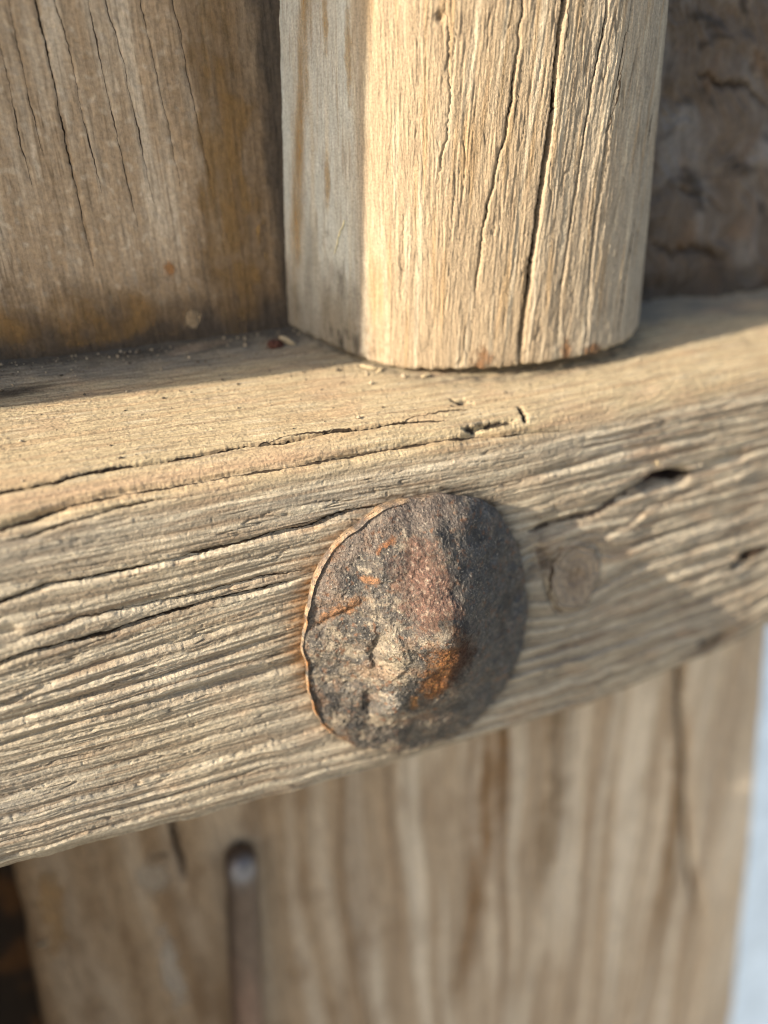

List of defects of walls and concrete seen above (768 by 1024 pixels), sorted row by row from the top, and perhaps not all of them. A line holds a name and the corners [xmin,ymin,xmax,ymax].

crack [0,0,101,266]
crack [88,0,154,227]
crack [474,2,523,307]
crack [548,0,570,118]
crack [523,175,541,299]
crack [0,409,572,541]
crack [528,487,633,532]
corrosion [295,578,360,732]
corrosion [397,538,477,707]